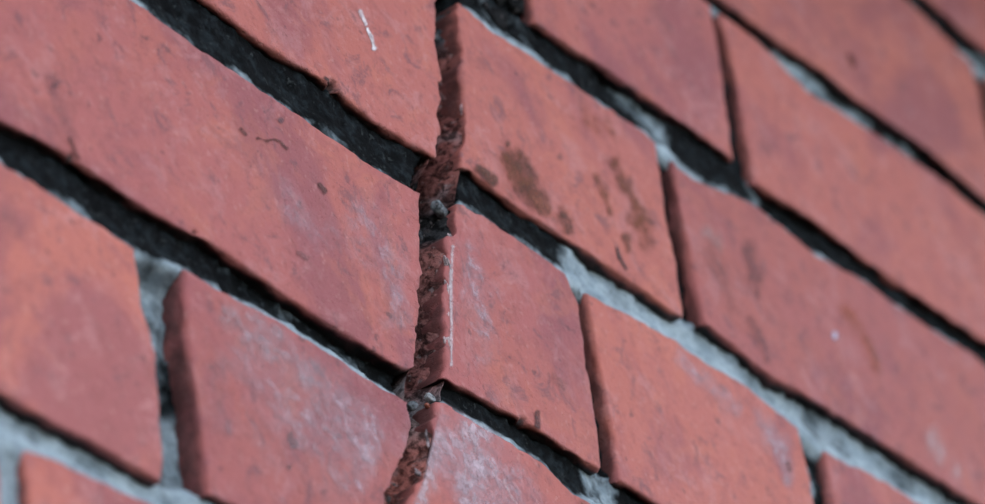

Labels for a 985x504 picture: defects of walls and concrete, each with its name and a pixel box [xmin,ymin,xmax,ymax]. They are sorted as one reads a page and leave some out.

crack [384,11,463,504]